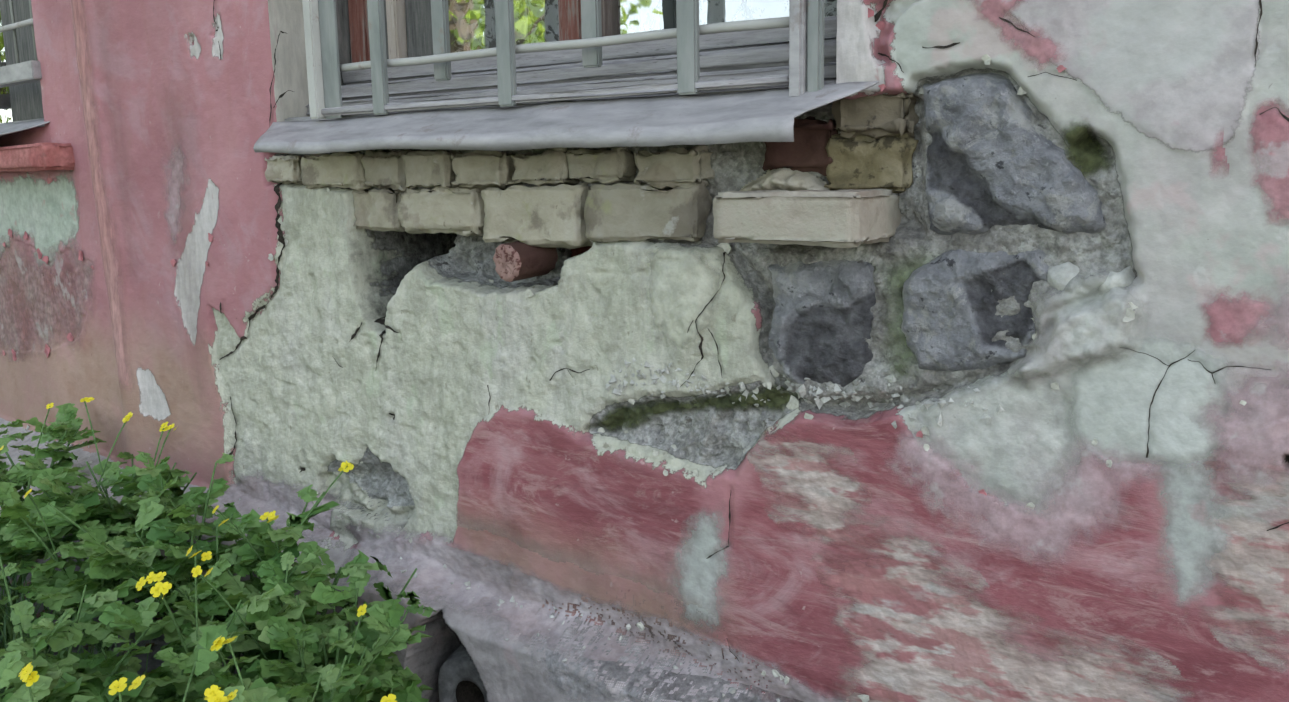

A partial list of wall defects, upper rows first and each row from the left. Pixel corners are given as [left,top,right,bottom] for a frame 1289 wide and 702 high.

peeling [836,0,886,97]
crack [1254,0,1262,67]
spalling [352,148,552,156]
spalling [795,102,841,134]
crack [1259,107,1289,122]
peeling [166,150,219,345]
crack [681,252,726,386]
peeling [136,368,171,421]
crack [1125,348,1271,458]
peeling [676,513,727,626]
peeling [1203,455,1289,664]
spalling [538,645,803,702]